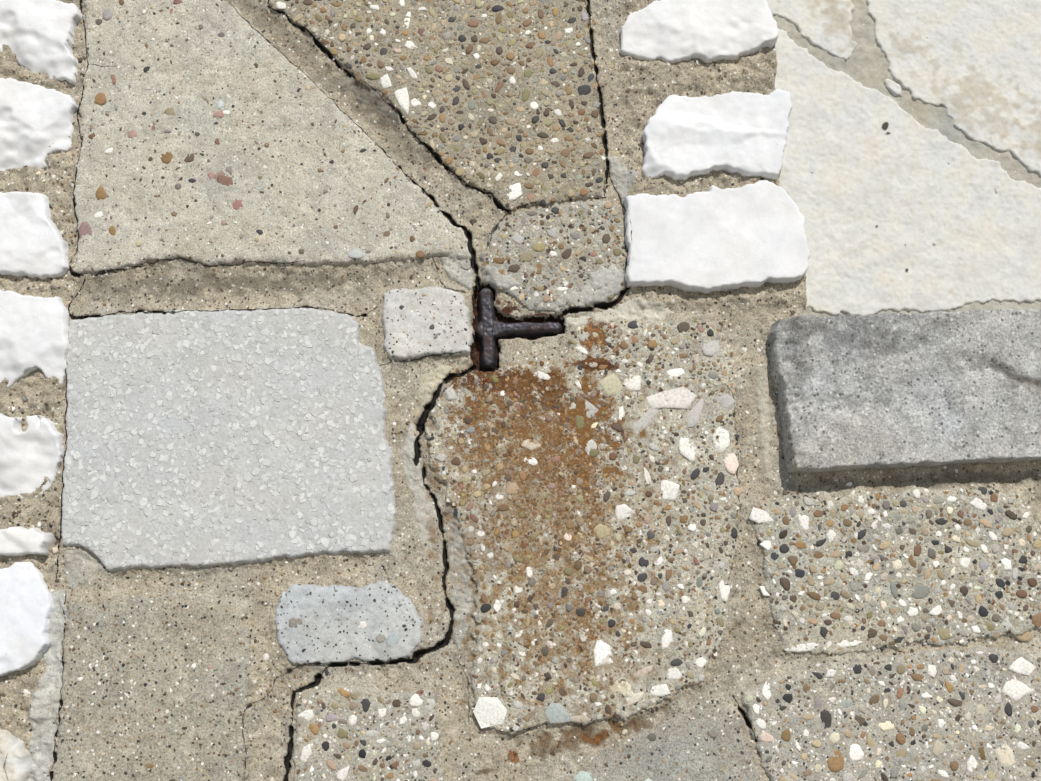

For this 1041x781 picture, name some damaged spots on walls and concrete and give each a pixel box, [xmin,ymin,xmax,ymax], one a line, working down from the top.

crack [233,0,536,293]
crack [558,0,632,318]
corrosion [445,318,653,693]